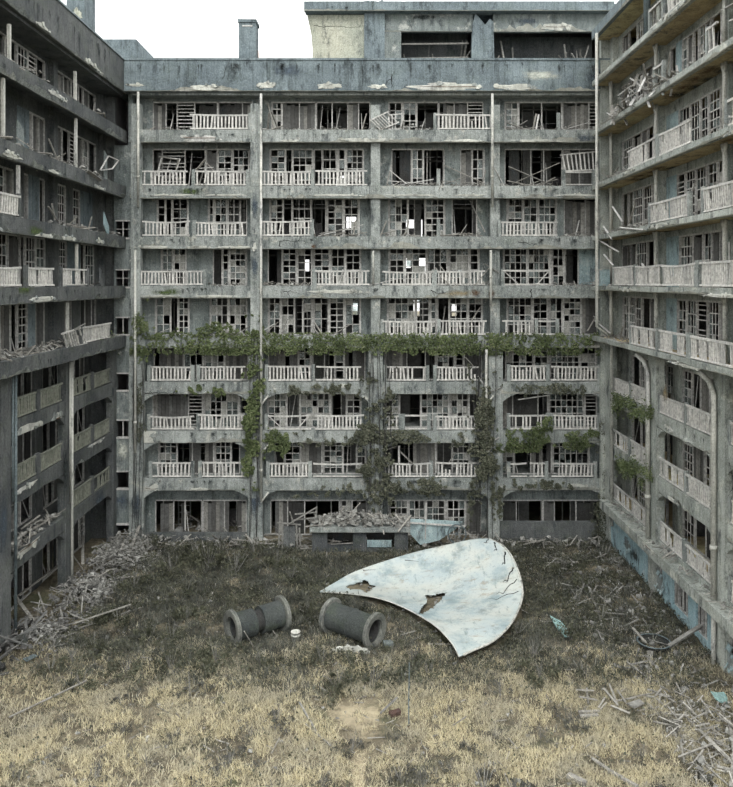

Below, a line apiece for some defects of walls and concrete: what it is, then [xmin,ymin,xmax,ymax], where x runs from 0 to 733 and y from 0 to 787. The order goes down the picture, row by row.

spalling [541,22,572,31]
spalling [406,81,481,90]